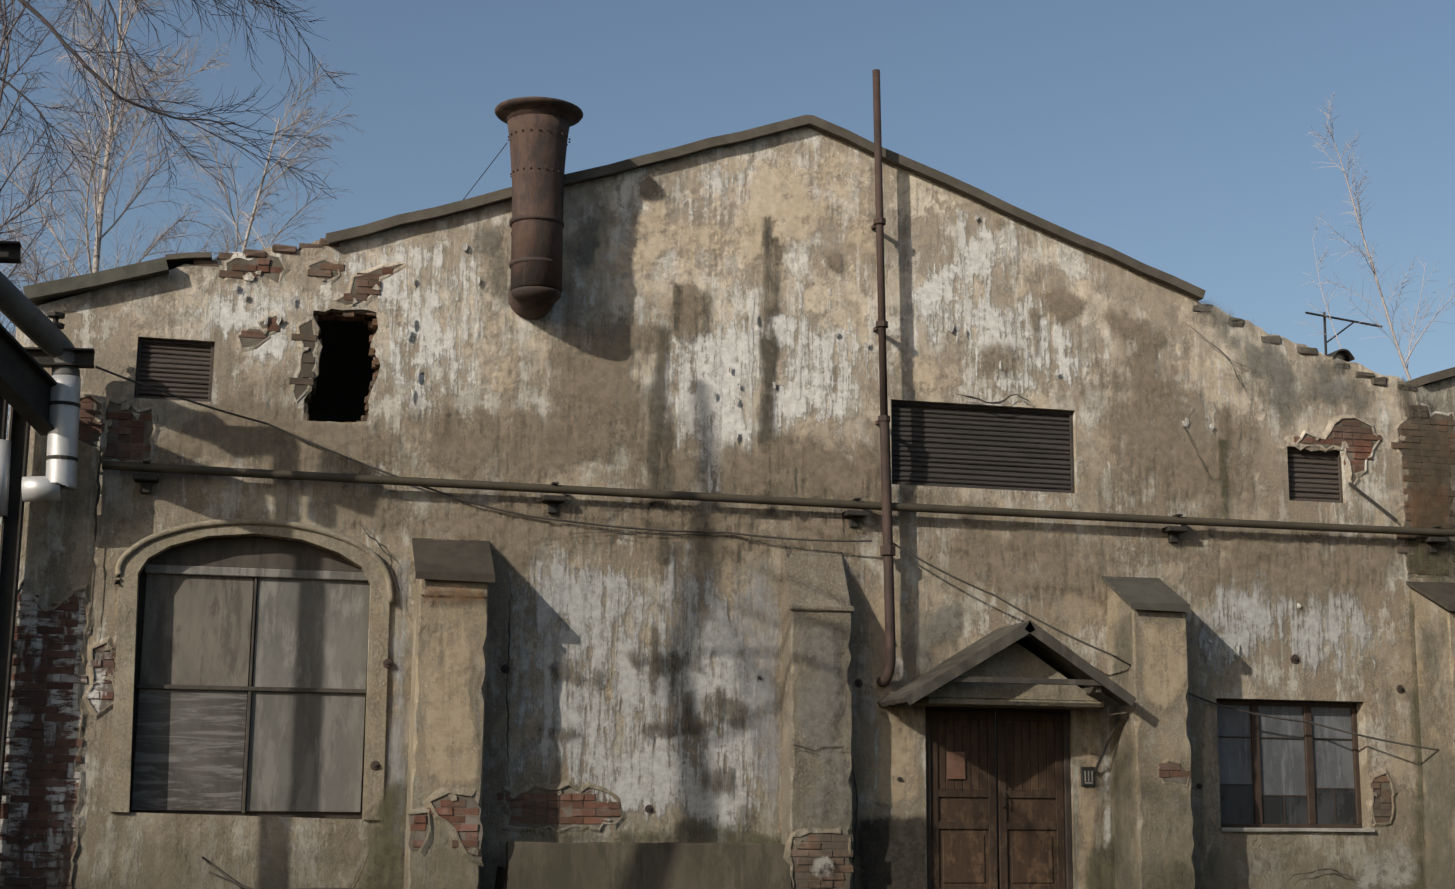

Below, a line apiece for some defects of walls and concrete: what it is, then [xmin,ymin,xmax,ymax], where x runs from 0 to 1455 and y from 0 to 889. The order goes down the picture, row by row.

spalling [78,391,160,463]
peeling [194,237,513,424]
damp [156,216,929,573]
spalling [1290,401,1455,581]
spalling [0,578,116,889]
flaking render [407,630,484,867]
peeling [498,542,773,843]
spalling [783,828,854,889]